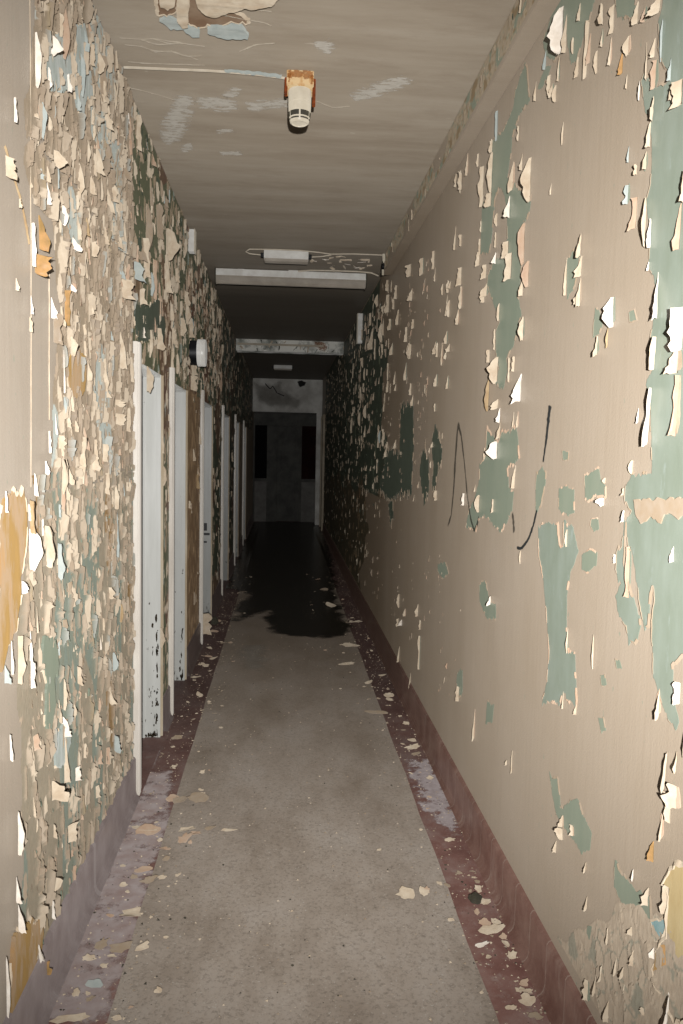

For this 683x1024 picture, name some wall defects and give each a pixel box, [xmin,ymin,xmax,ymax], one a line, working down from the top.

flaking render [154,0,277,40]
peeling [256,0,535,596]
peeling [454,0,683,731]
peeling [0,0,253,1018]
water stain [226,522,353,638]
peeling [394,580,430,689]
peeling [438,648,463,701]
peeling [472,699,494,741]
peeling [549,771,592,874]
peeling [646,751,681,862]
peeling [581,950,634,1001]
flaking render [614,859,683,1024]